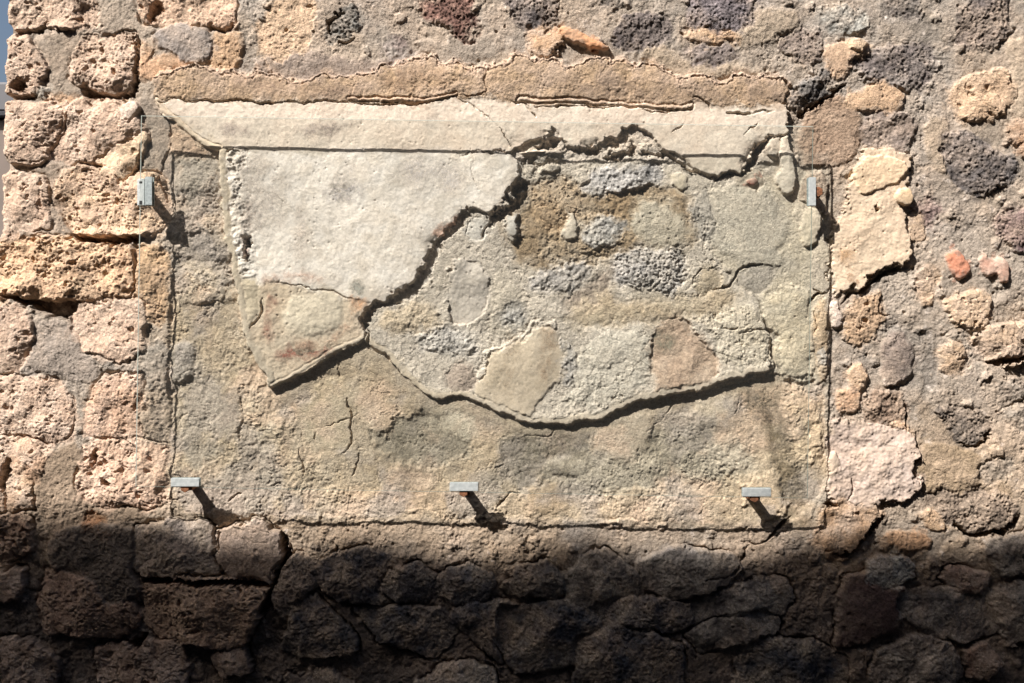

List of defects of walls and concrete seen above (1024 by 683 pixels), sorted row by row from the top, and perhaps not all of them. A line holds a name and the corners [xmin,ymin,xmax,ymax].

crack [129,68,780,347]
spalling [365,125,796,420]
crack [271,361,366,496]
crack [719,384,741,415]
crack [721,301,795,396]